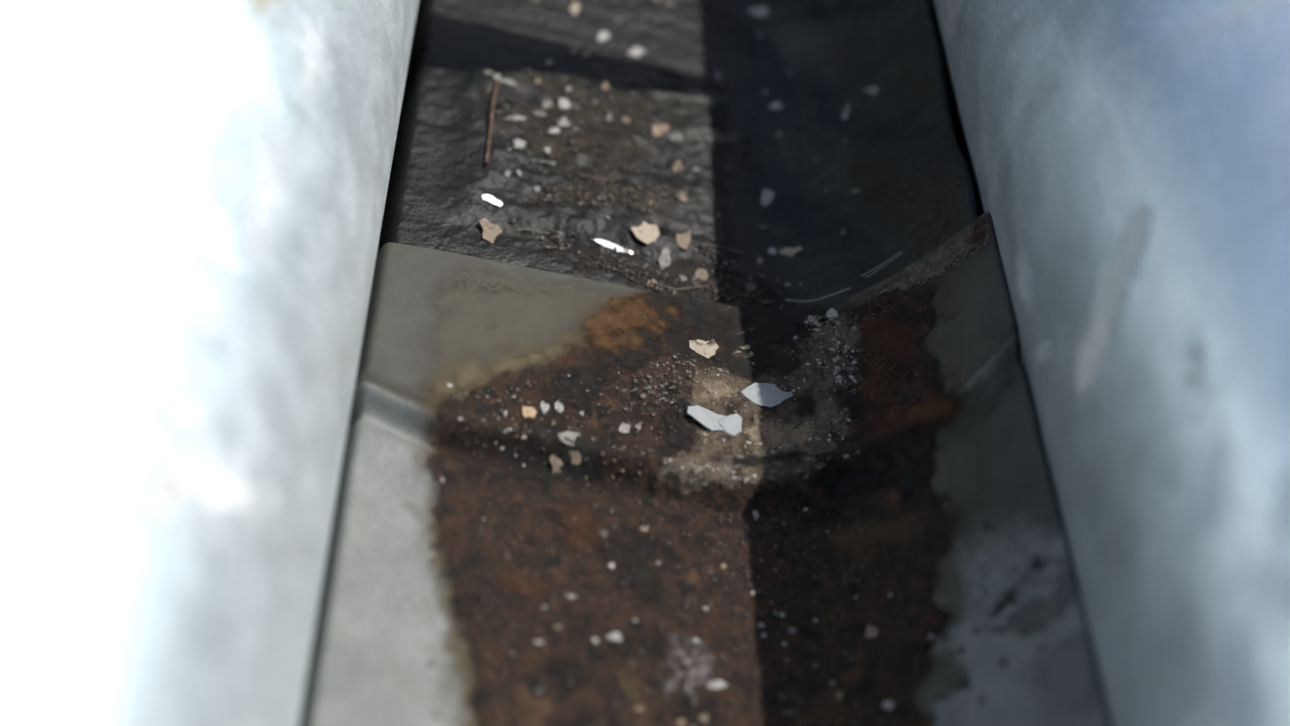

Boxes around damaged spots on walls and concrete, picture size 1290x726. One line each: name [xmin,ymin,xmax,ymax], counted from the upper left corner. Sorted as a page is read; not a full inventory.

corrosion [426,281,959,726]